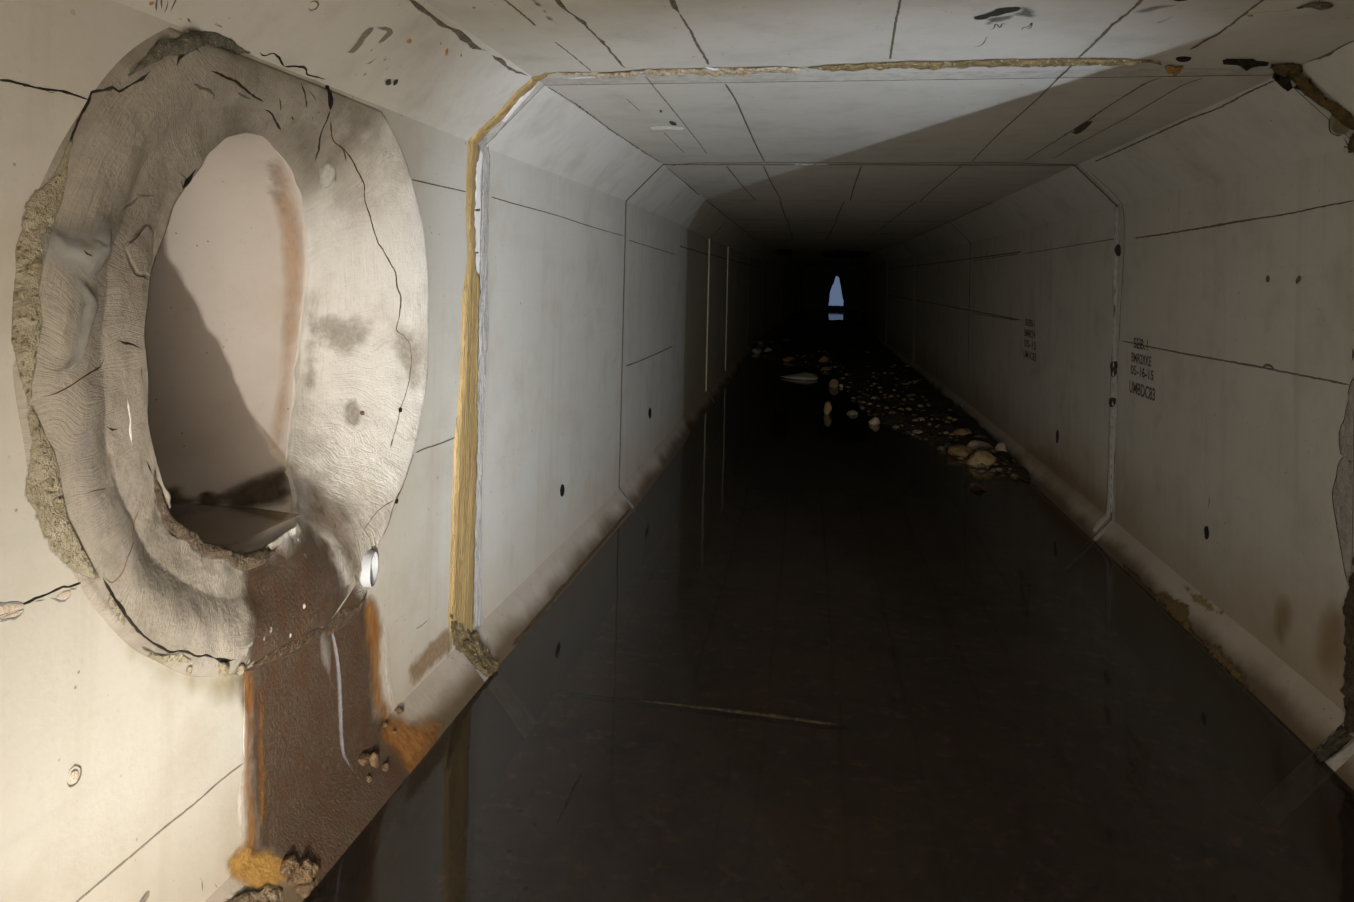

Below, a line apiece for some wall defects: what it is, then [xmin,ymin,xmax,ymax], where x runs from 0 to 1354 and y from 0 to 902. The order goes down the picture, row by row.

spalling [312,85,333,161]
crack [0,48,414,534]
spalling [153,470,279,571]
spalling [1314,378,1354,763]
corrosion [228,588,436,890]